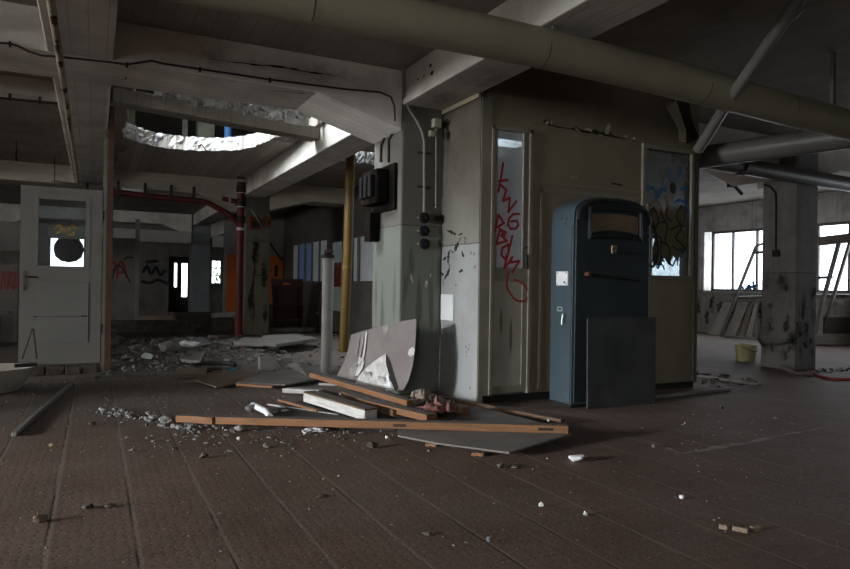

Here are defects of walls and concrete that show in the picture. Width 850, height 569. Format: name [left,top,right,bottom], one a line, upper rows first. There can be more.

spalling [154,91,311,126]
spalling [124,123,270,151]
crack [642,426,830,454]